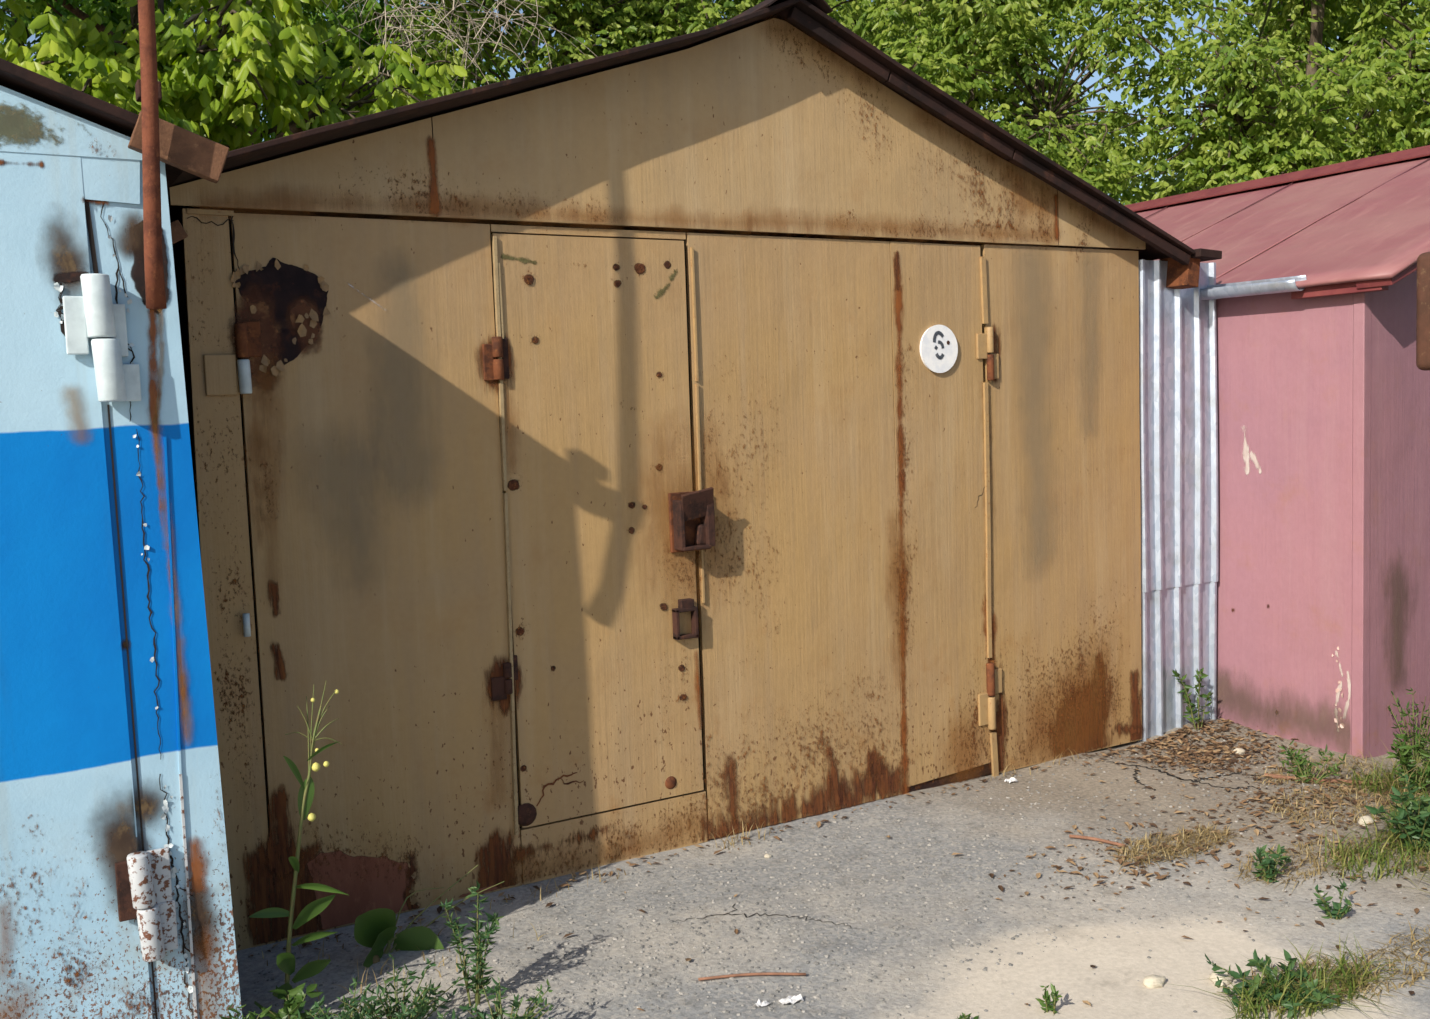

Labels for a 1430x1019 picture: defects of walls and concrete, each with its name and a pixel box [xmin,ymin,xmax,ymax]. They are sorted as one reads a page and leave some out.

corrosion [379,137,467,217]
corrosion [501,253,537,285]
corrosion [613,263,645,287]
corrosion [654,261,677,299]
corrosion [149,309,162,512]
corrosion [659,231,934,847]
corrosion [954,582,1143,784]
corrosion [3,866,106,993]
corrosion [187,839,227,955]
corrosion [243,778,323,945]
corrosion [475,823,648,891]
corrosion [99,989,163,1019]